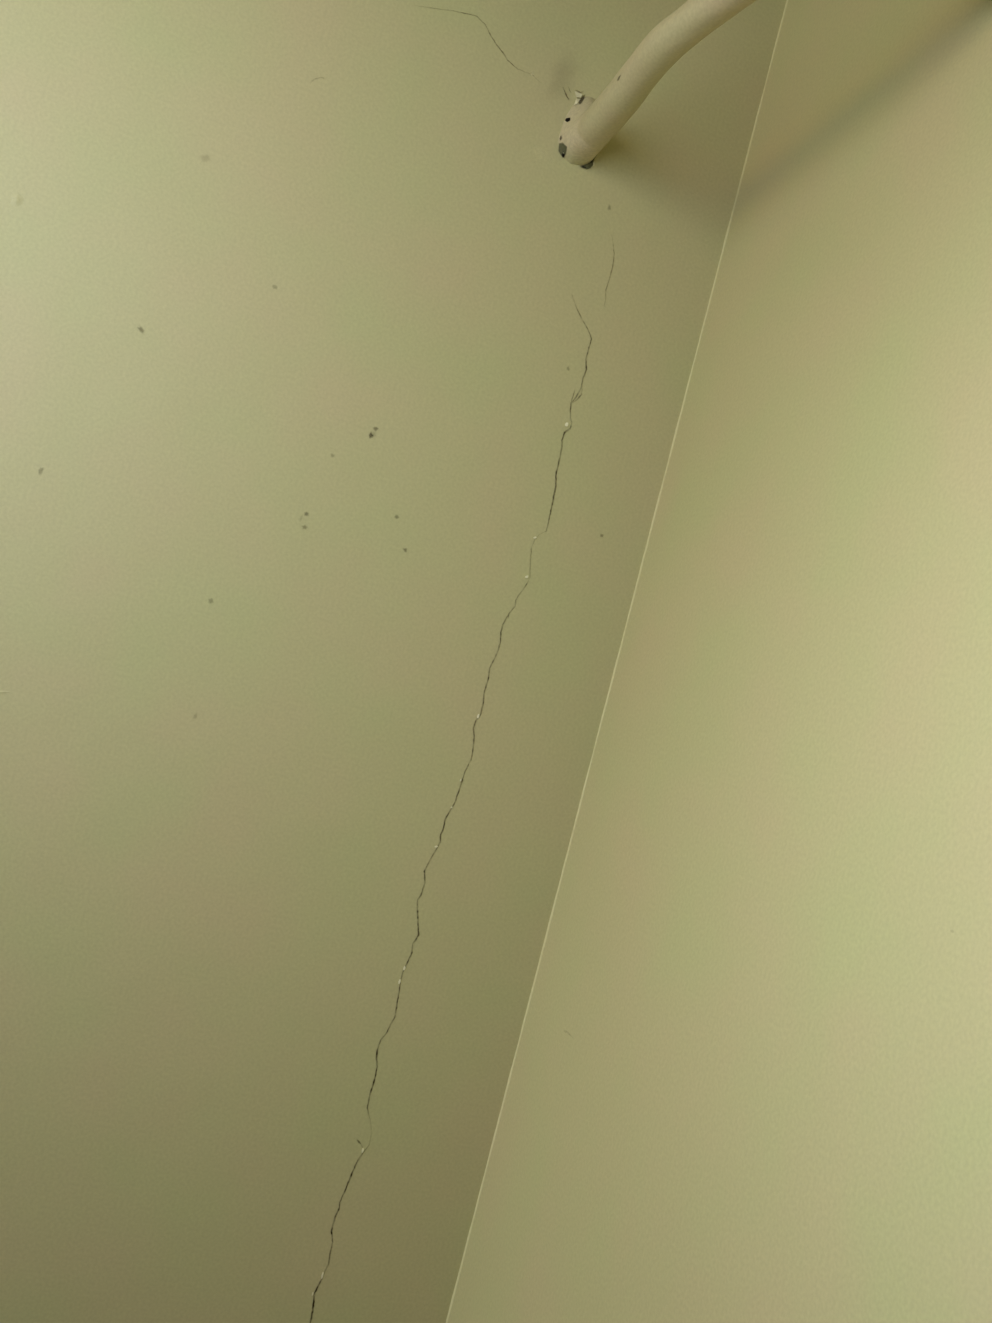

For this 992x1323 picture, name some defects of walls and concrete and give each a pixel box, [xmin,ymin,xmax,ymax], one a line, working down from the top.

crack [310,1141,364,1323]